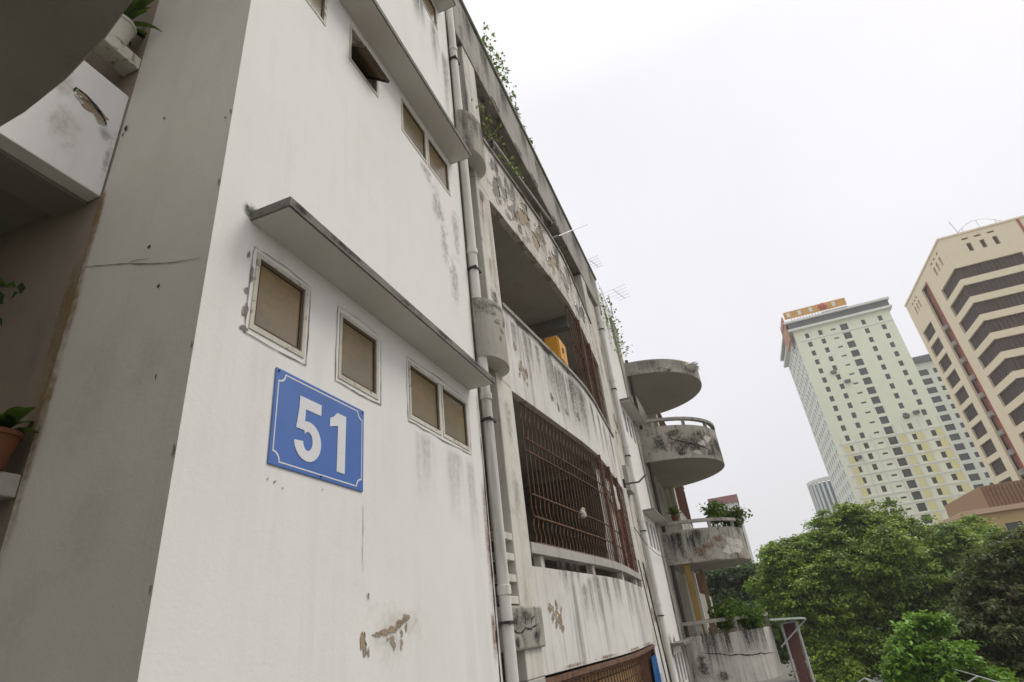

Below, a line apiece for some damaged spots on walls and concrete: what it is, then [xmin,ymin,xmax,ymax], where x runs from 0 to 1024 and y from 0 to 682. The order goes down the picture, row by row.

flaking render [74,89,109,126]
peeling [489,156,585,323]
crack [85,258,198,267]
mould [653,430,723,459]
peeling [722,537,743,555]
peeling [548,600,564,632]
peeling [360,614,410,657]
crack [704,650,773,658]